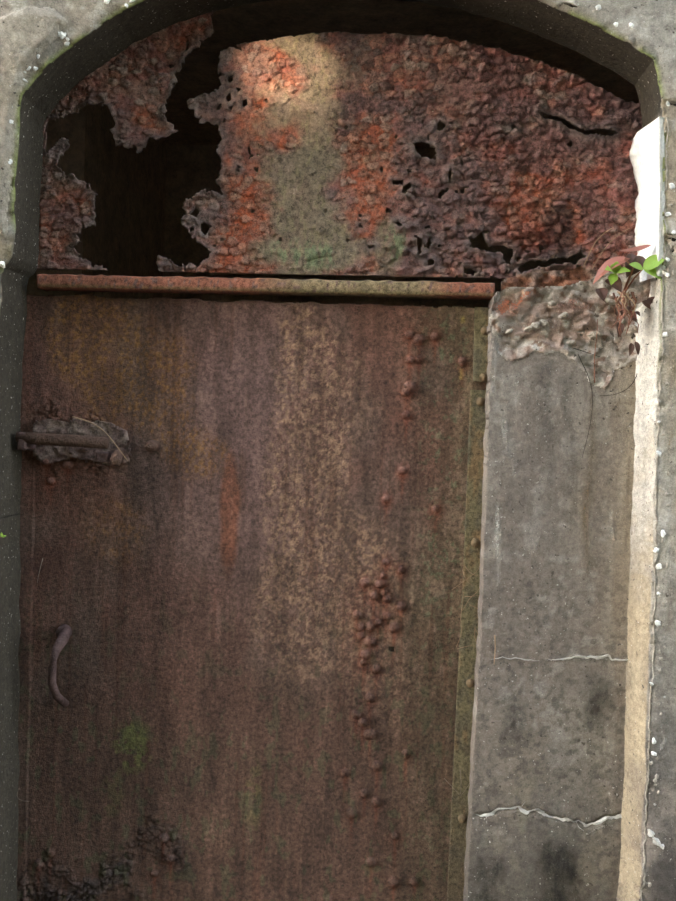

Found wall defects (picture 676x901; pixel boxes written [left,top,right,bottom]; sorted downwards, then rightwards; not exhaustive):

spalling [489,272,651,389]
crack [640,101,676,901]
crack [491,653,628,661]
crack [476,802,622,834]